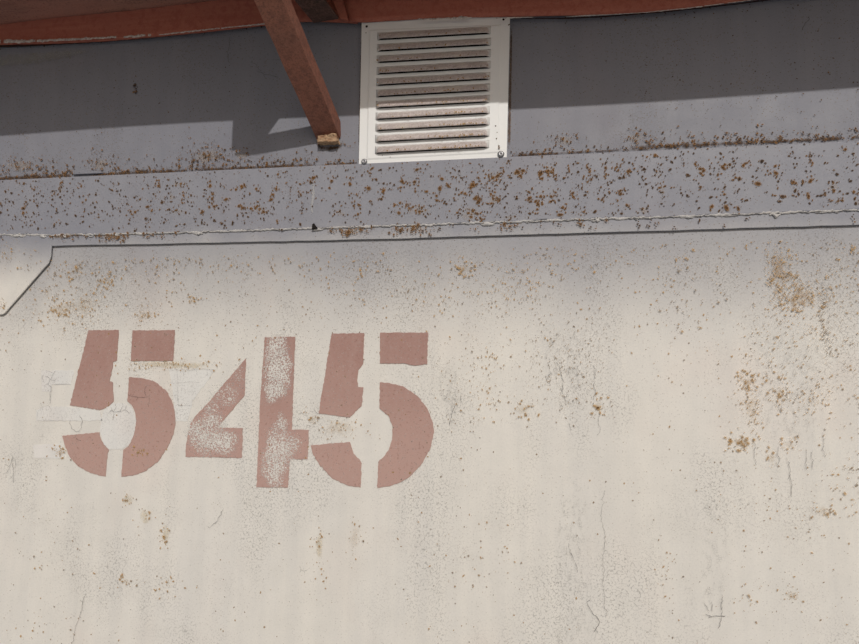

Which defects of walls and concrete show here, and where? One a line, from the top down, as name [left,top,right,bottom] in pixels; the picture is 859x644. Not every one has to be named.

corrosion [521,0,767,24]
corrosion [0,37,154,50]
corrosion [449,324,540,424]